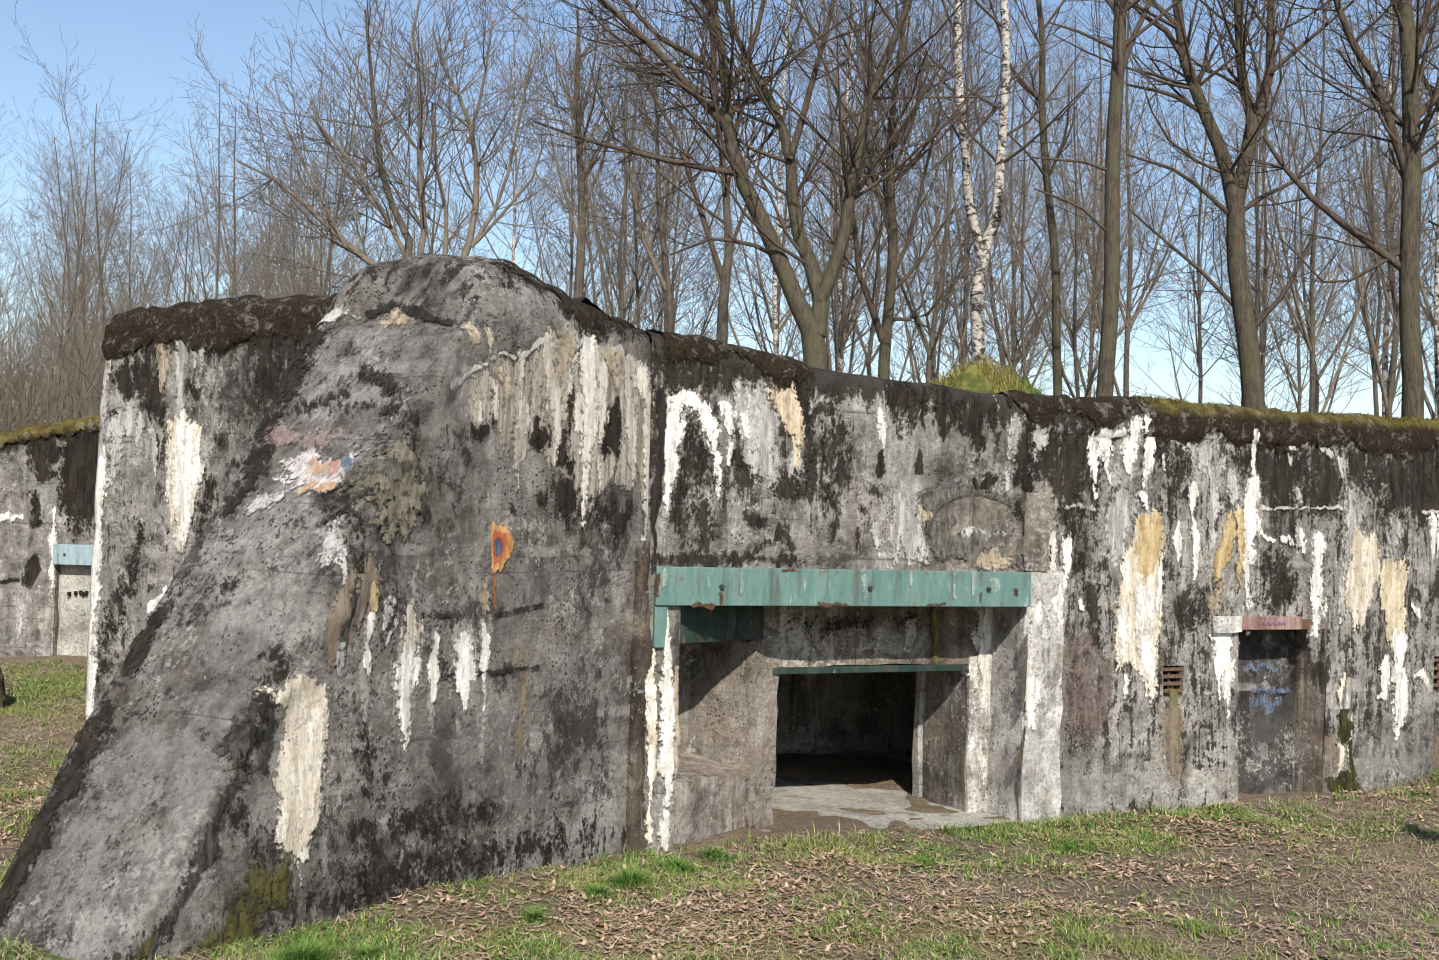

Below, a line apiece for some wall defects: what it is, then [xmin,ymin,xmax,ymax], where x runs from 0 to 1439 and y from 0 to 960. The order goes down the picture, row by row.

leakage [458,322,806,587]
leakage [1024,666,1045,730]
leakage [1028,414,1430,750]
leakage [1426,512,1439,587]